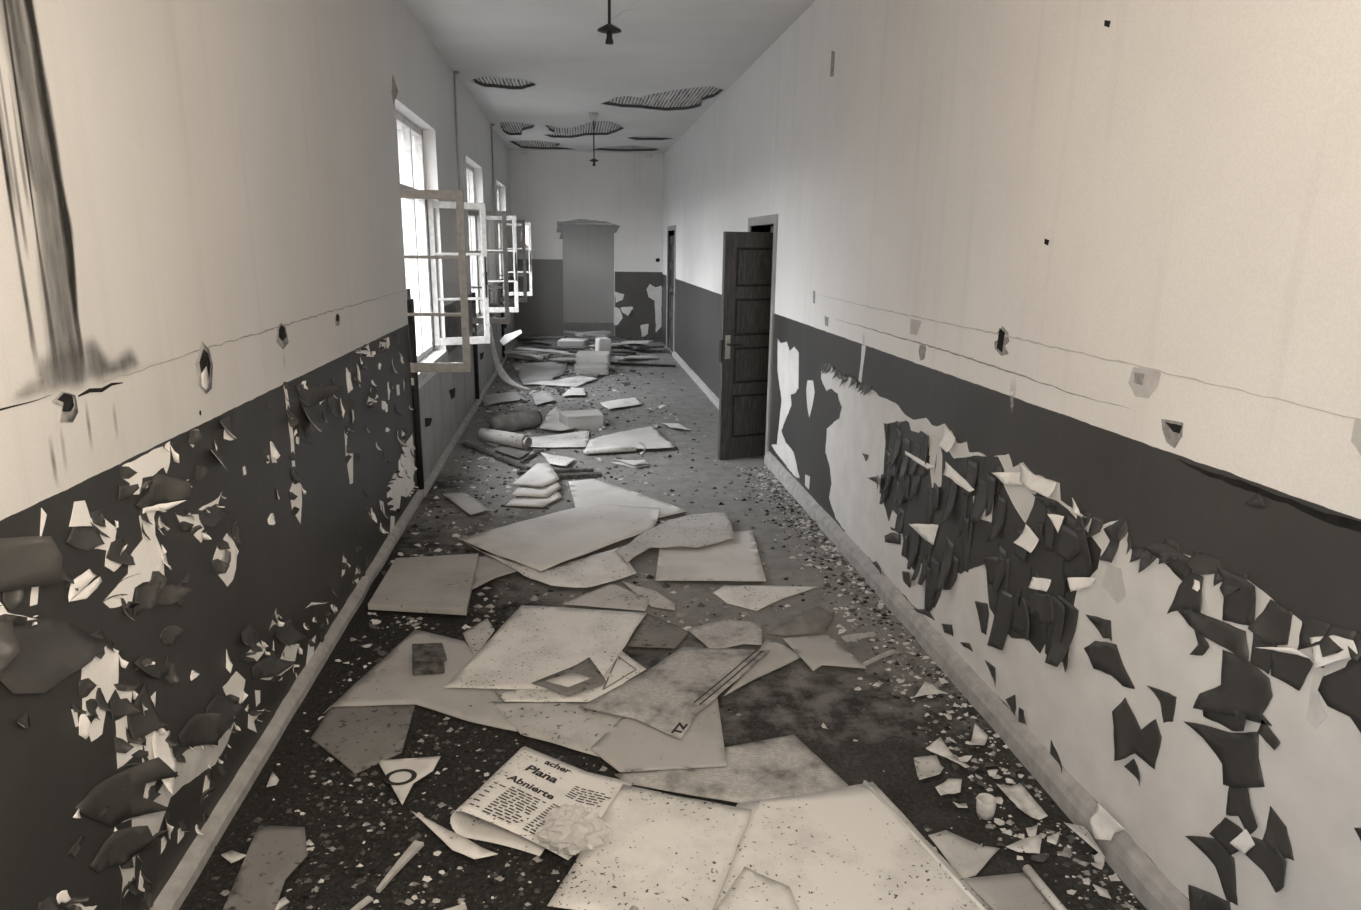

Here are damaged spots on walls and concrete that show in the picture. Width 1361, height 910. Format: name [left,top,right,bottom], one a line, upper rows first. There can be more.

water stain [0,0,132,381]
peeling [480,316,594,407]
flaking render [500,86,725,152]
peeling [614,284,662,337]
peeling [0,335,448,910]
peeling [742,340,1361,910]